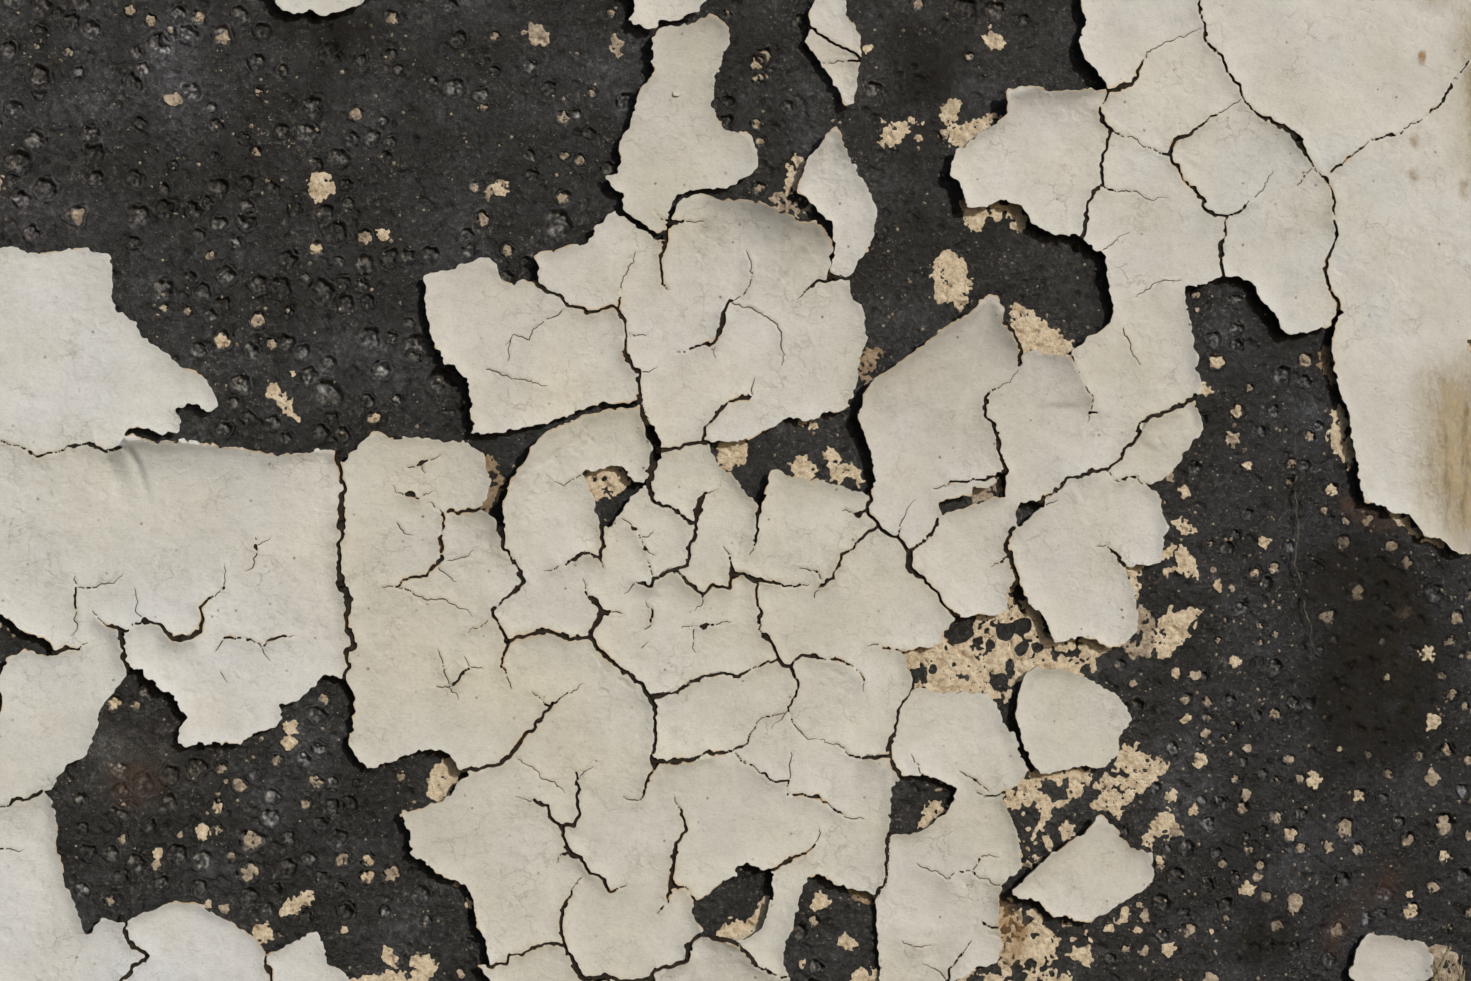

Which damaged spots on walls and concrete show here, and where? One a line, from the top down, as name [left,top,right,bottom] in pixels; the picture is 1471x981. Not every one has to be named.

spalling [0,59,89,231]
spalling [120,173,261,361]
spalling [178,81,264,159]
spalling [121,0,364,99]
spalling [246,105,444,321]
crack [1,440,122,458]
crack [991,393,1197,589]
water stain [1431,376,1471,534]
crack [51,537,295,682]
crack [334,218,1023,981]
crack [0,790,42,807]
crack [119,914,150,981]